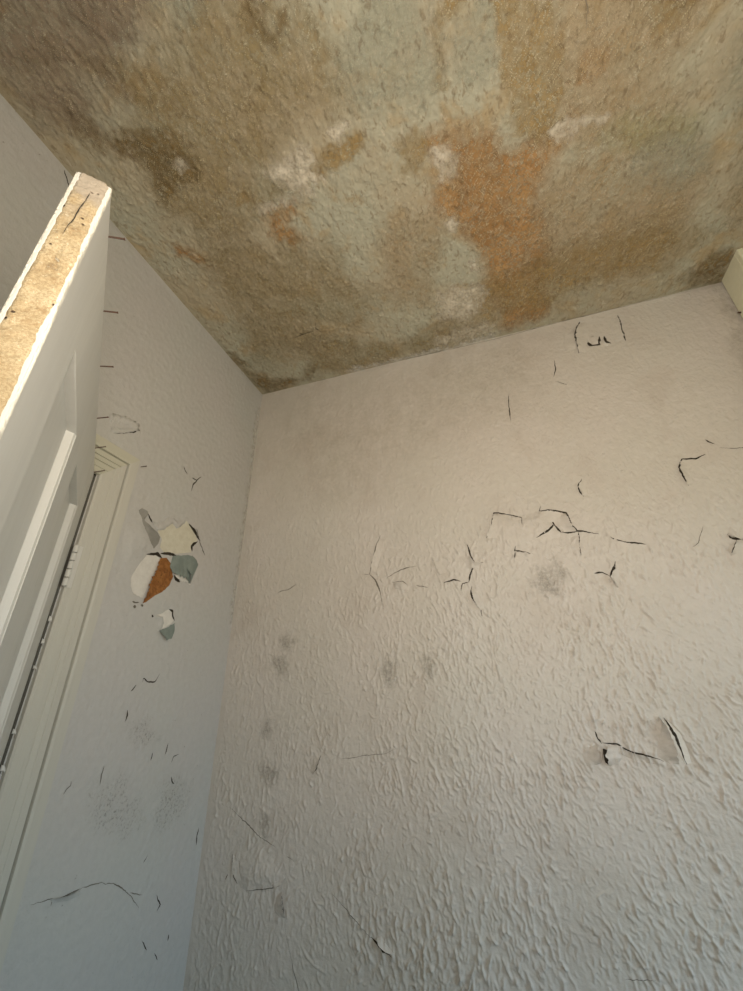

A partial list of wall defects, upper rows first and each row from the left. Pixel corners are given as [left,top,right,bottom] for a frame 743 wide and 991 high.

water stain [0,0,122,148]
water stain [113,0,330,232]
water stain [478,0,681,319]
water stain [690,251,734,286]
peeling [564,315,626,353]
flaking render [131,508,200,608]
flaking render [152,609,175,640]
peeling [583,717,692,766]
crack [33,882,161,909]